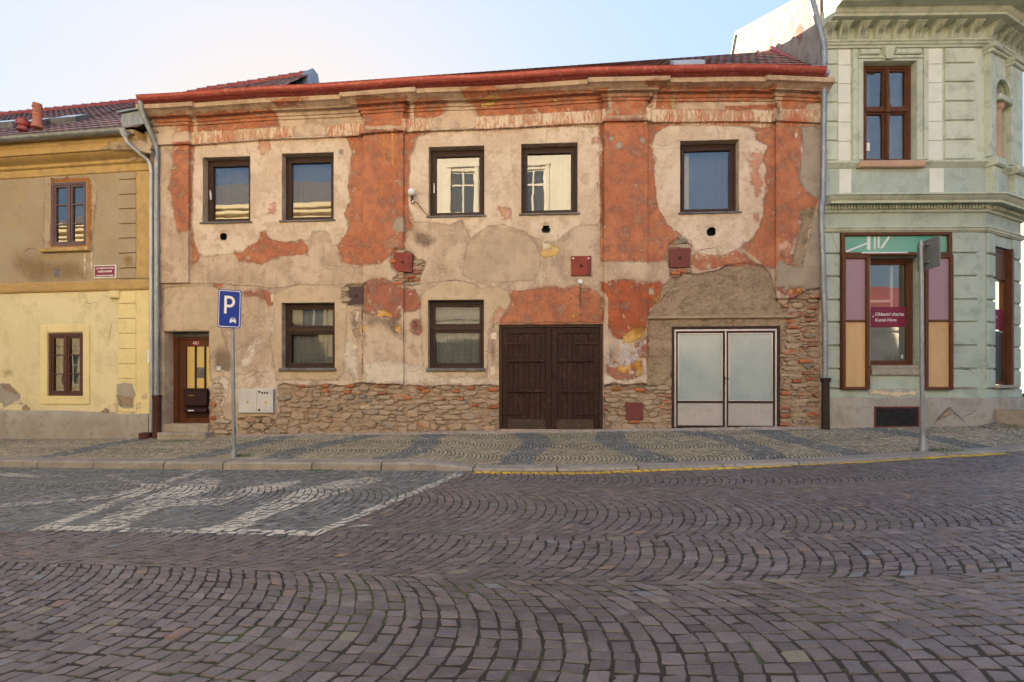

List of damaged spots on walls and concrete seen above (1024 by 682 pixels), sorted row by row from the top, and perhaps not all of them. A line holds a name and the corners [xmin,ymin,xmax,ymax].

peeling [101,97,308,265]
peeling [338,96,446,351]
peeling [462,80,822,429]
flaking render [0,383,30,410]
flaking render [101,383,146,413]